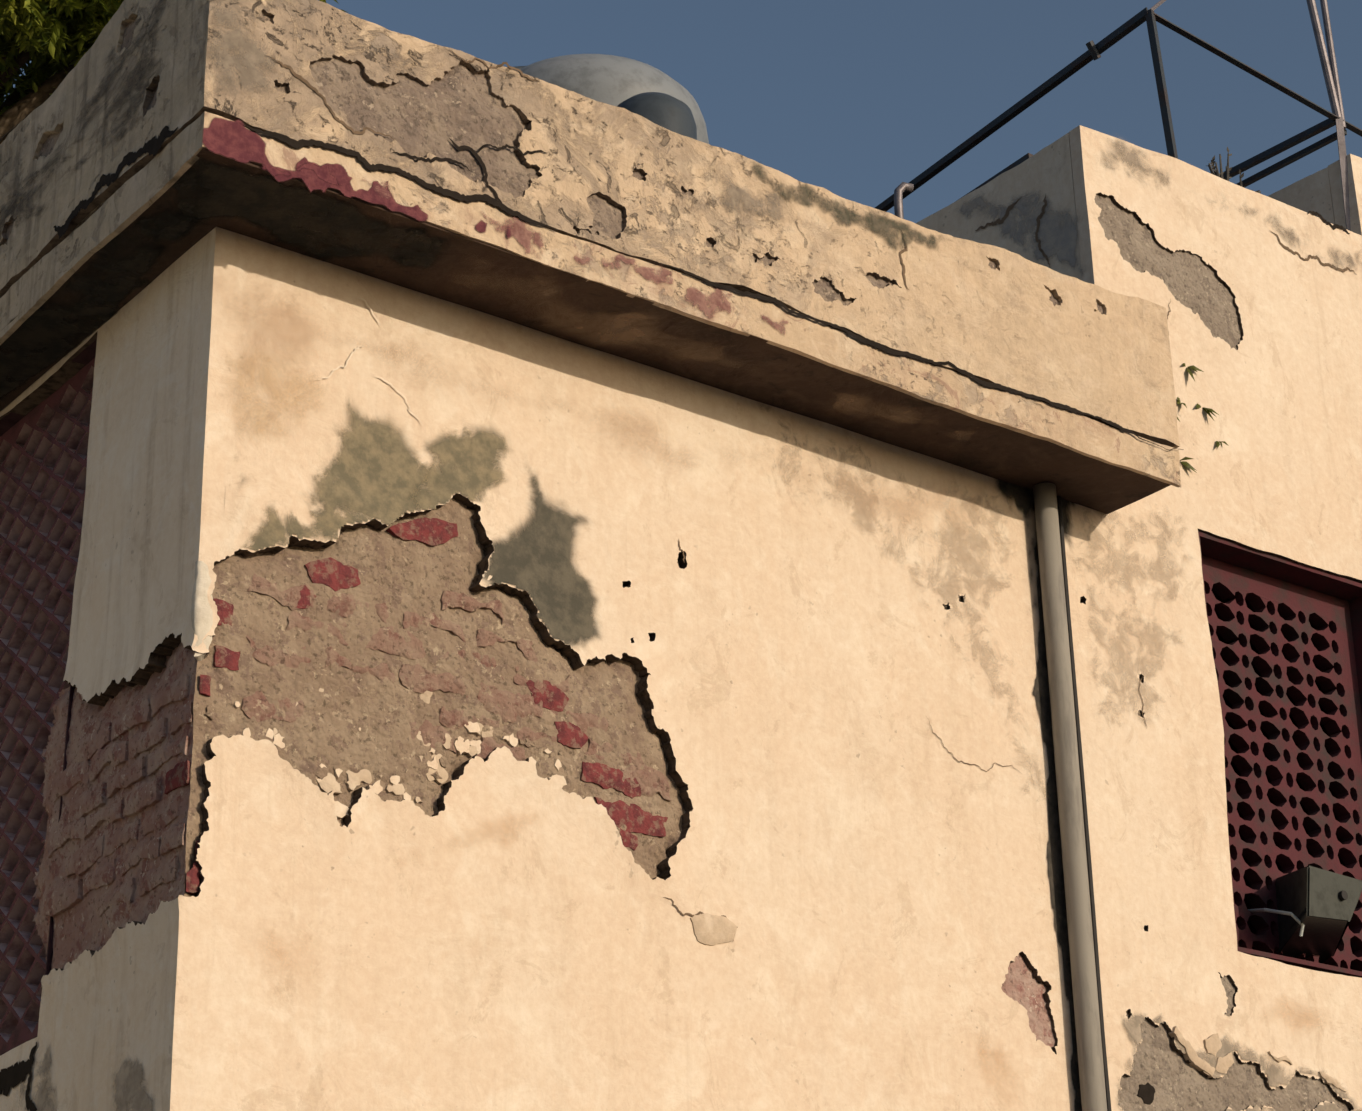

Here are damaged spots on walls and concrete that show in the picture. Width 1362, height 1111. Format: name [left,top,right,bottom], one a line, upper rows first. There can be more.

water stain [81,0,162,139]
water stain [0,157,446,399]
peeling [203,117,428,221]
crack [241,55,556,230]
crack [899,231,909,290]
crack [651,261,1184,450]
spalling [1094,194,1241,350]
crack [1269,211,1357,275]
water stain [247,408,507,551]
water stain [484,476,598,645]
spalling [32,497,686,969]
spalling [1117,1011,1349,1111]